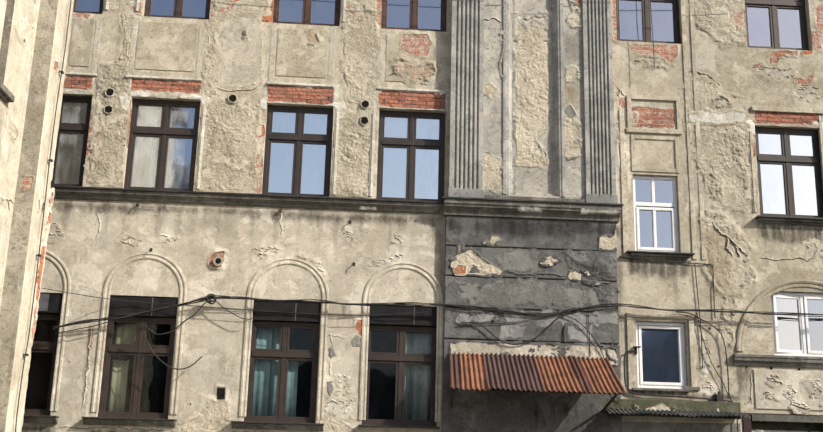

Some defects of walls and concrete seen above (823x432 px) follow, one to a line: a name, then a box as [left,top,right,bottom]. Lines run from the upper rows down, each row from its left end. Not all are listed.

flaking render [53,0,450,199]
flaking render [483,9,583,195]
flaking render [16,174,67,347]
flaking render [352,316,362,339]
peeling [443,234,619,367]
flaking render [611,0,823,398]
crack [712,221,823,262]
flaking render [152,382,239,432]
flaking render [304,372,361,432]
flaking render [632,402,676,414]